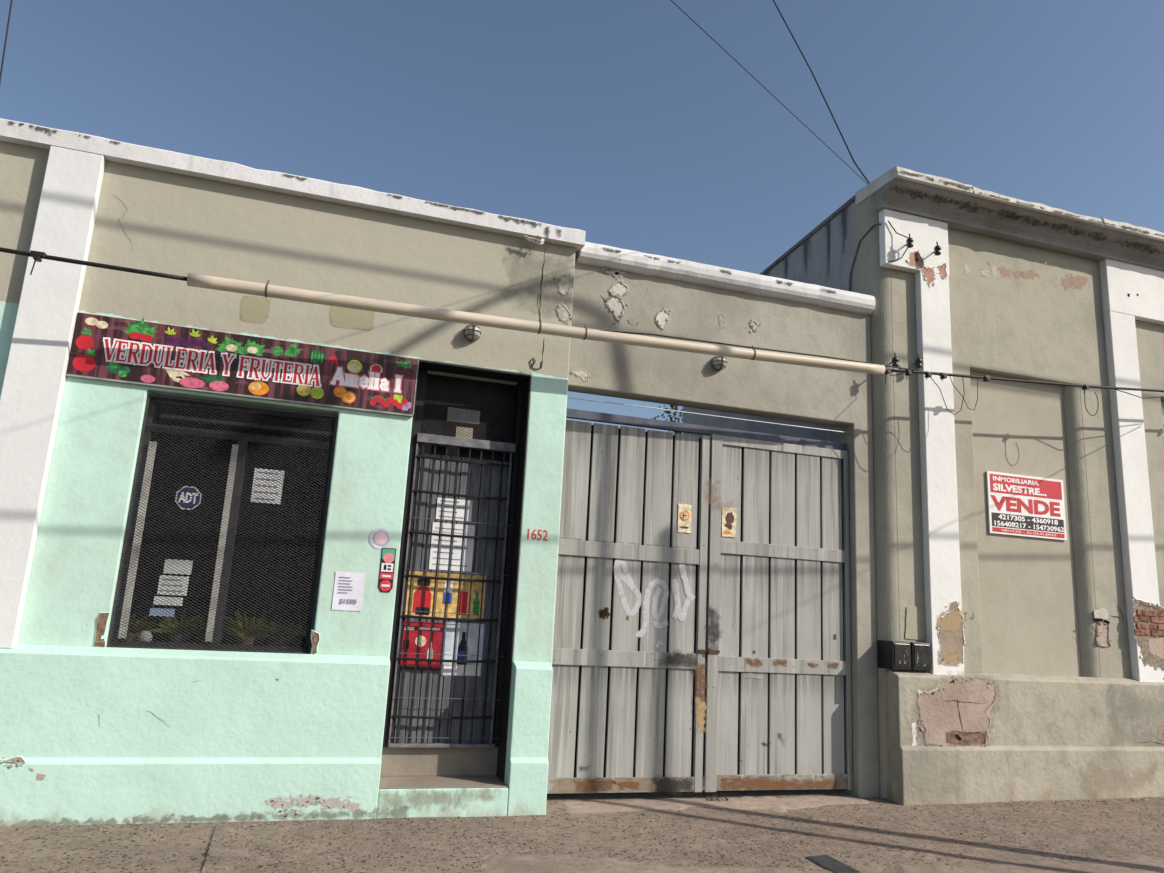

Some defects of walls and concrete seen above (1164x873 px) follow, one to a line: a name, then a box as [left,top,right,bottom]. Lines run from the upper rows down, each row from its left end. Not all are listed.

peeling [905,250,948,286]
peeling [964,261,1039,280]
peeling [600,268,639,326]
peeling [654,307,672,331]
spalling [1092,597,1164,679]
spalling [911,600,1000,747]
corrosion [695,664,707,732]
spalling [2,756,46,780]
corrosion [574,779,638,793]
corrosion [721,777,837,790]
peeling [265,794,360,818]